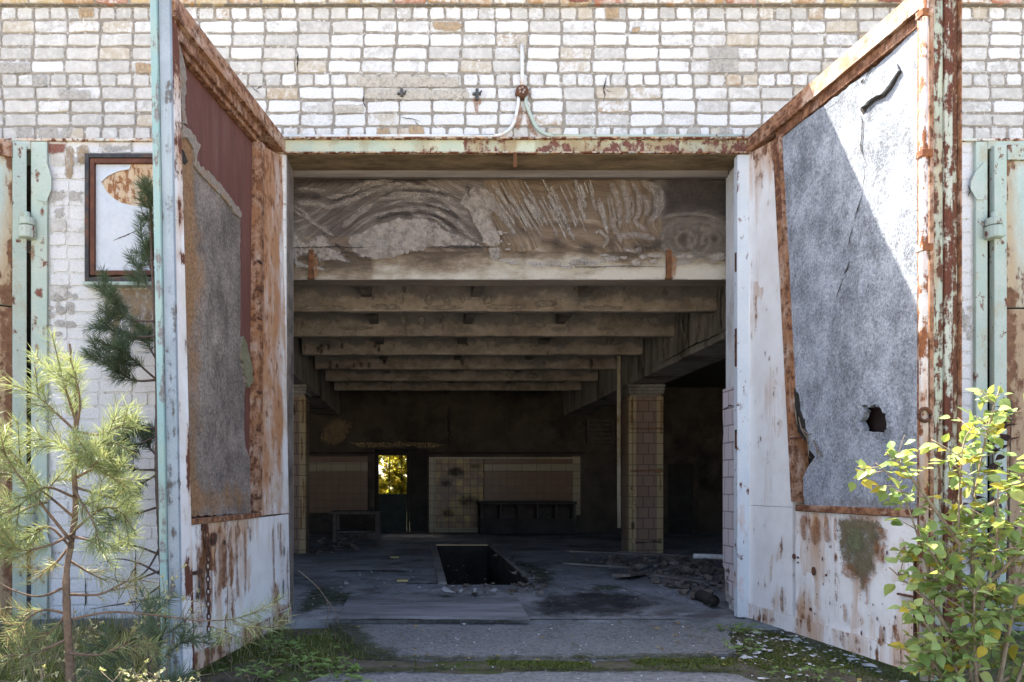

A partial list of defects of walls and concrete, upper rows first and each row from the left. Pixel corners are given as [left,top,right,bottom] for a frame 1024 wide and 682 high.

spalling [348,187,661,268]
crack [837,119,865,294]
rust [202,526,247,613]
rust [272,524,289,597]
rust [800,515,837,543]